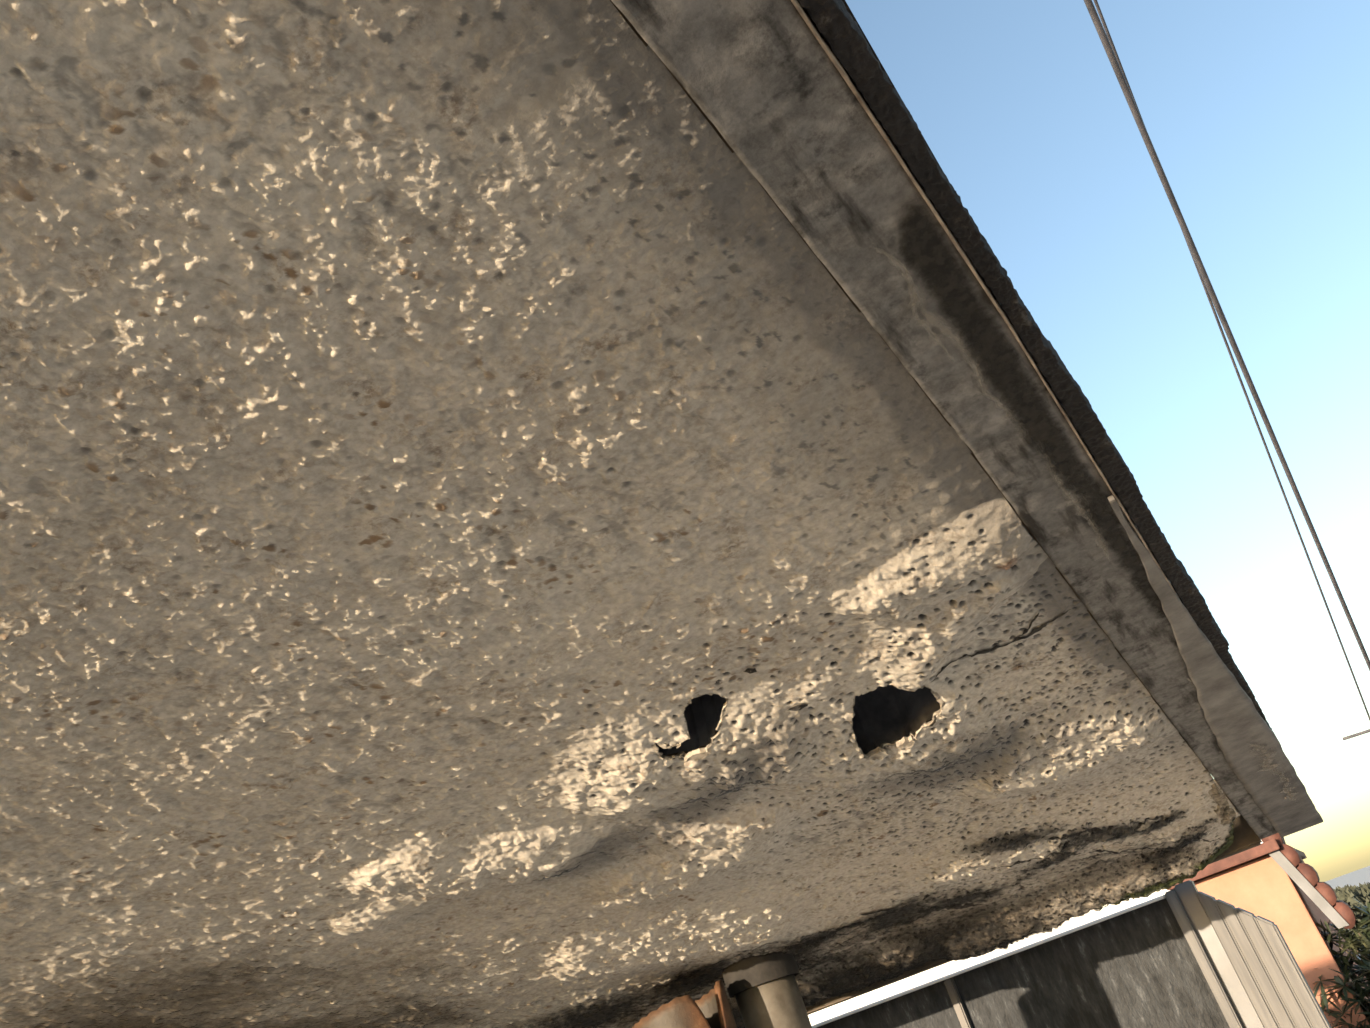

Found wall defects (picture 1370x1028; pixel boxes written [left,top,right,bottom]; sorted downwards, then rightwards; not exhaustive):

damp [881,204,1166,618]
spalling [656,694,726,762]
spalling [852,685,941,761]
damp [971,811,1185,875]
damp [1141,818,1216,877]
damp [515,864,1111,1028]
damp [33,974,254,1028]